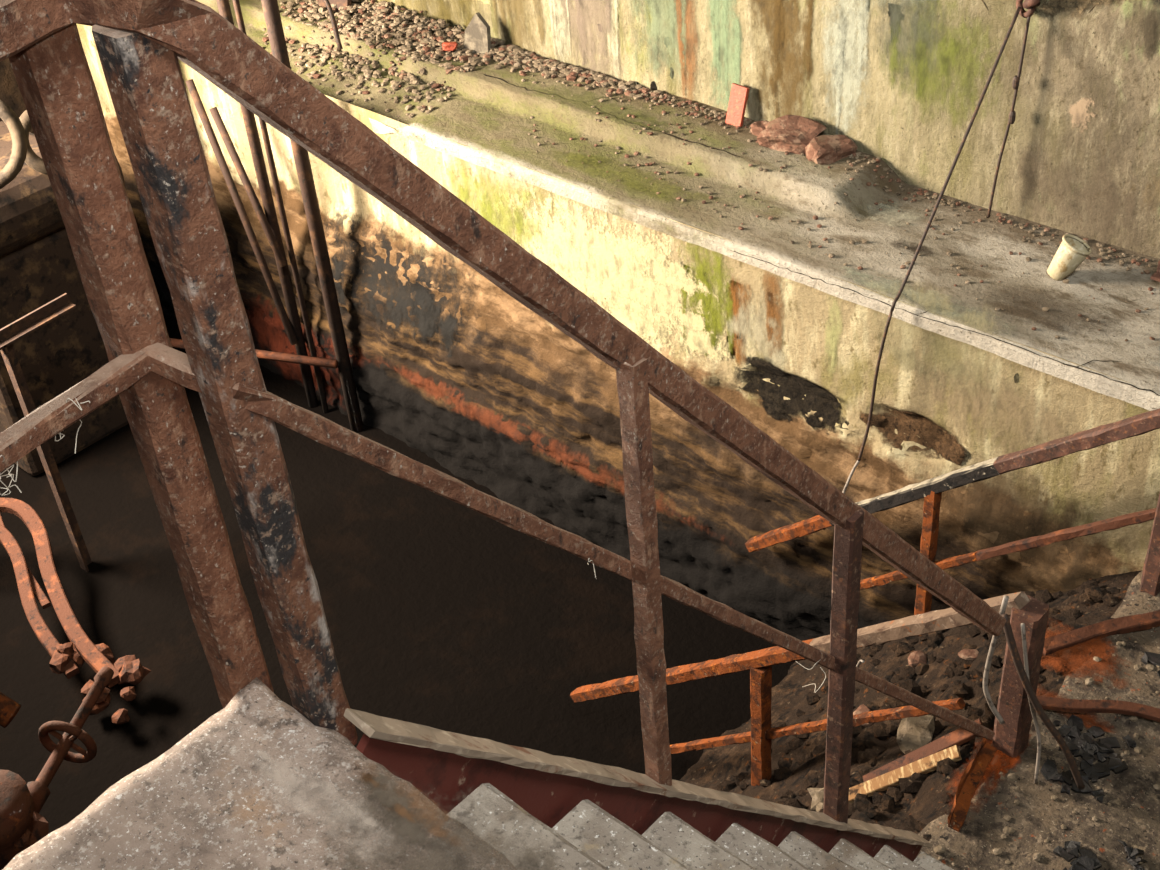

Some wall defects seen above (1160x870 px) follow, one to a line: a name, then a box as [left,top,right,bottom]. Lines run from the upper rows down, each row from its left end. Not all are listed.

corrosion [676,0,698,96]
spalling [76,24,176,318]
damp [325,213,476,357]
spalling [178,59,630,560]
damp [702,279,733,350]
spalling [325,95,1149,503]
spalling [649,393,835,641]
spalling [857,545,917,629]
spalling [872,498,924,552]
spalling [931,595,951,611]
spalling [935,429,1160,600]